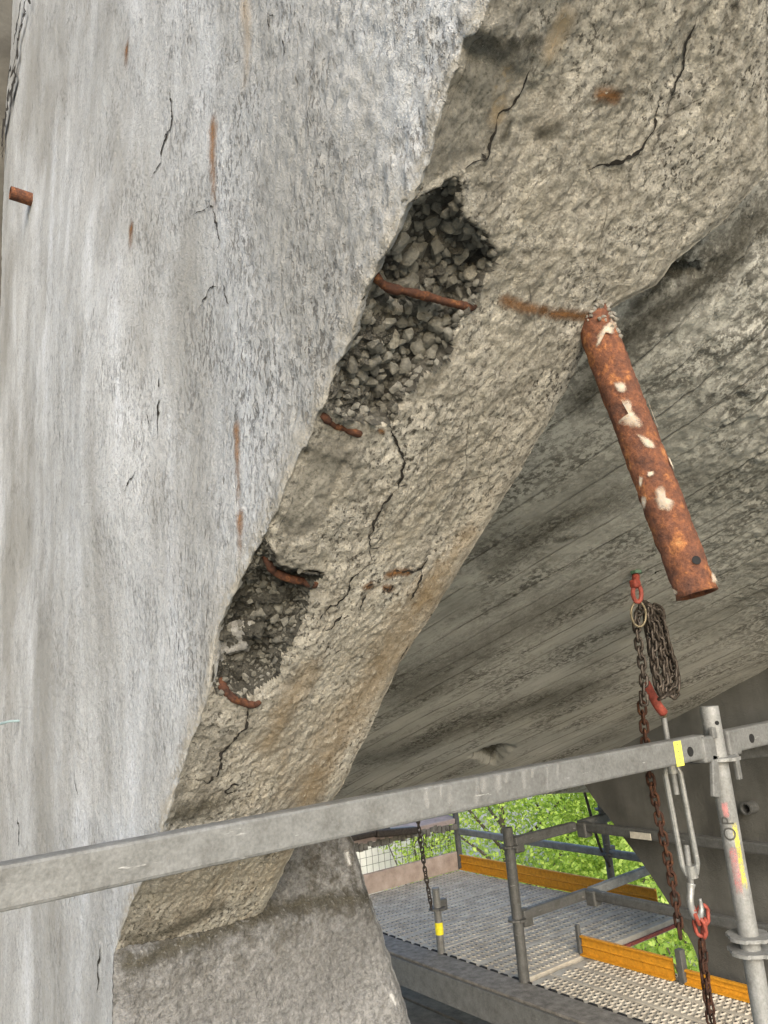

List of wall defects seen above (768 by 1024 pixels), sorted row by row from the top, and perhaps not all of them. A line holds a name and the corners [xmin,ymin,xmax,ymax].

crack [152,93,173,176]
crack [465,68,531,169]
rust [595,88,620,102]
crack [589,17,697,170]
spalling [324,176,500,426]
rust [502,296,589,320]
crack [316,426,428,654]
spalling [211,538,324,701]
crack [190,708,249,794]